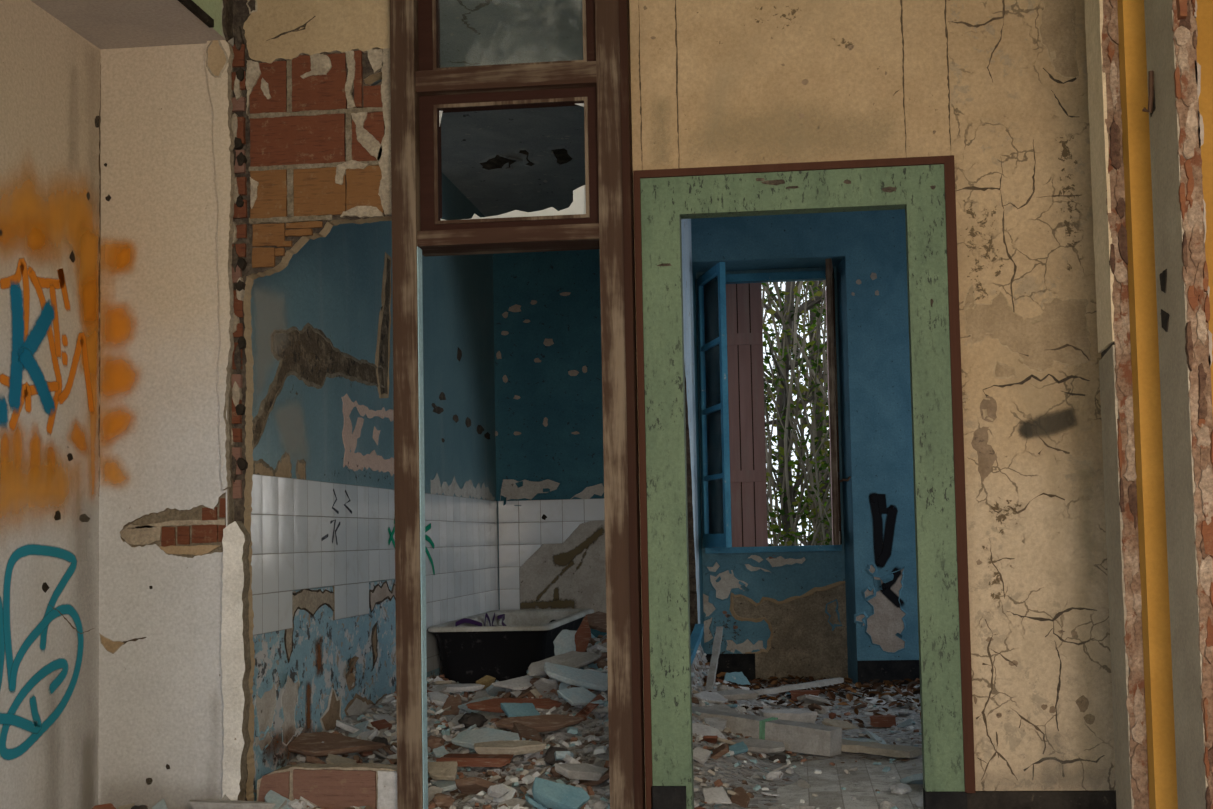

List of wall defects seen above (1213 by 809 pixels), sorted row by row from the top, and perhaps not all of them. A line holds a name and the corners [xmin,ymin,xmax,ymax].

crack [944,0,1005,149]
crack [1043,68,1079,117]
flaking render [120,0,394,556]
crack [956,139,1081,312]
crack [983,344,1090,397]
crack [1038,435,1070,455]
peeling [254,589,334,755]
peeling [320,580,395,731]
peeling [520,521,606,613]
peeling [703,553,809,654]
peeling [825,562,907,654]
crack [976,493,1104,780]